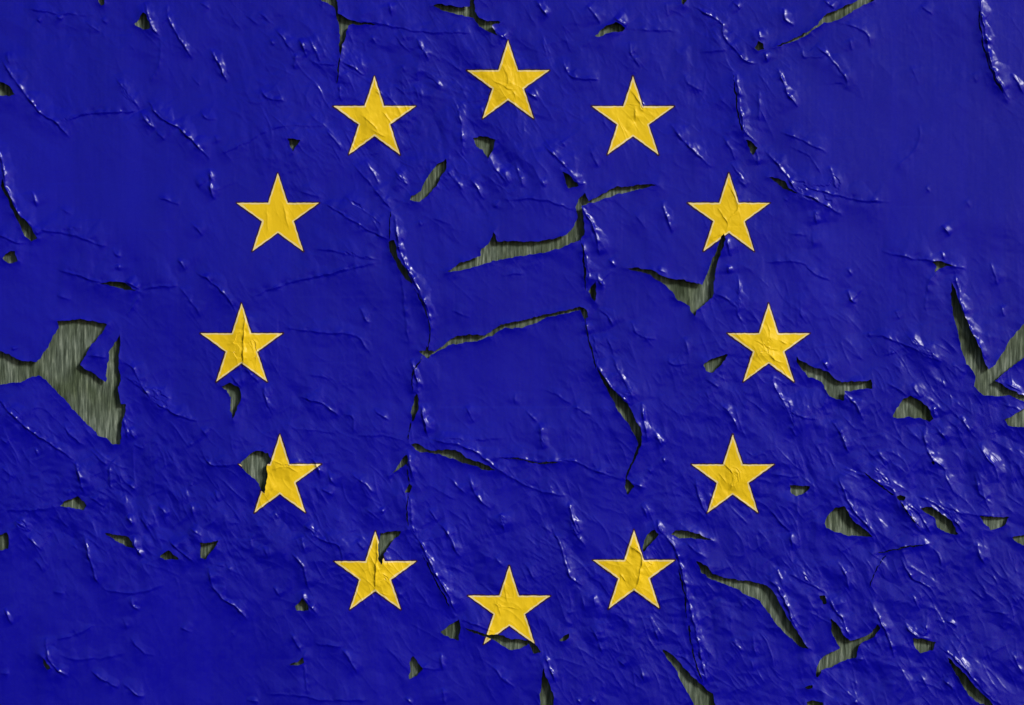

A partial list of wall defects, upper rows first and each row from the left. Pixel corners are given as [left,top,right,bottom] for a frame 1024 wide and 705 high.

peeling [406,156,450,204]
peeling [443,168,661,275]
peeling [623,234,728,319]
peeling [0,316,130,447]
crack [385,209,645,618]
peeling [793,353,876,404]
peeling [891,393,937,424]
peeling [947,278,1024,430]
peeling [237,448,272,493]
peeling [821,504,876,540]
peeling [693,557,882,705]
peeling [659,646,718,705]